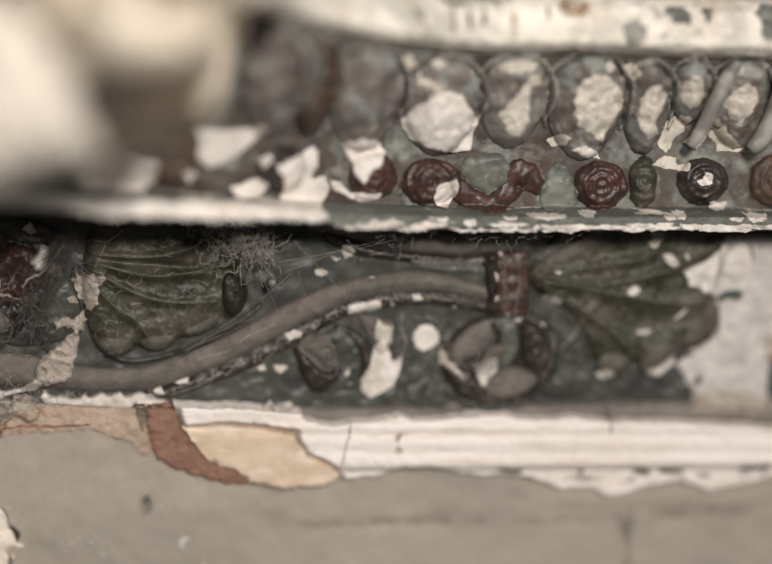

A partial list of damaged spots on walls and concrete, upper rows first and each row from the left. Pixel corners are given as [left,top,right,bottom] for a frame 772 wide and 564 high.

peeling [402,53,417,71]
peeling [494,60,537,74]
peeling [196,126,268,168]
peeling [401,91,479,153]
peeling [498,84,532,138]
peeling [546,60,641,159]
peeling [637,75,704,171]
peeling [695,66,759,152]
flaking render [0,139,772,416]
spalling [0,378,343,490]
peeling [630,468,685,476]
peeling [0,506,24,564]